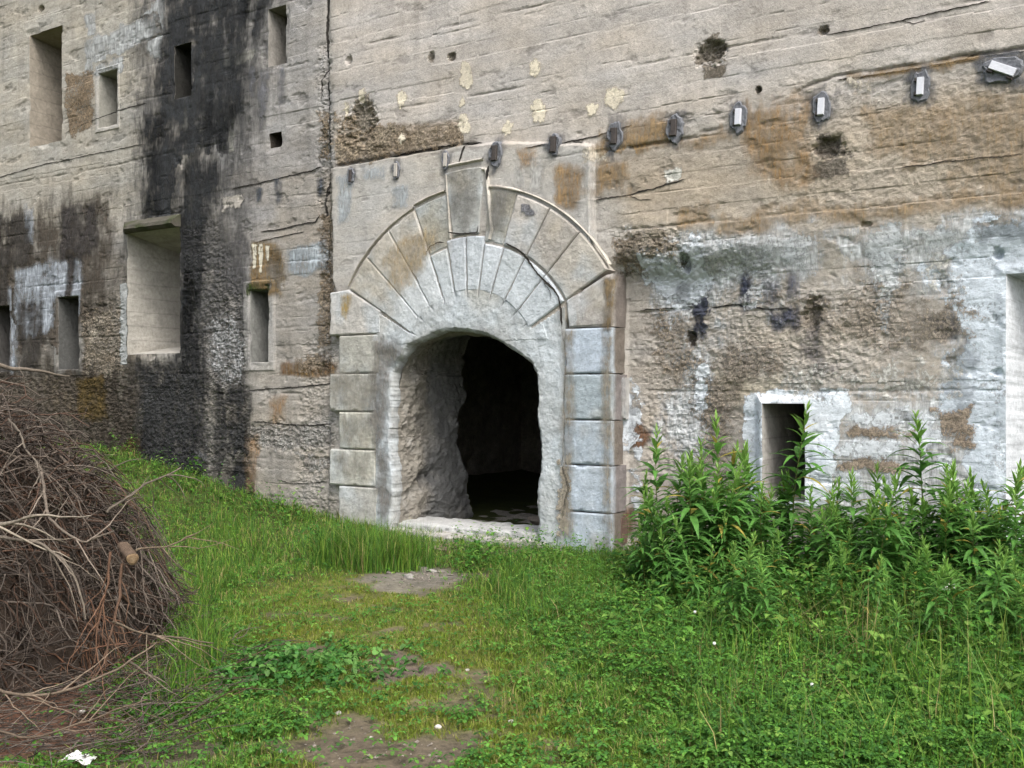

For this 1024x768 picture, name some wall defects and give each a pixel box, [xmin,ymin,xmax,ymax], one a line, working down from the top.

spalling [695,32,727,79]
crack [232,0,489,270]
spalling [316,93,464,165]
rust [597,117,668,191]
crack [596,179,684,200]
spalling [812,133,854,178]
water stain [0,0,269,496]
spalling [295,208,335,374]
peeling [611,211,1024,526]